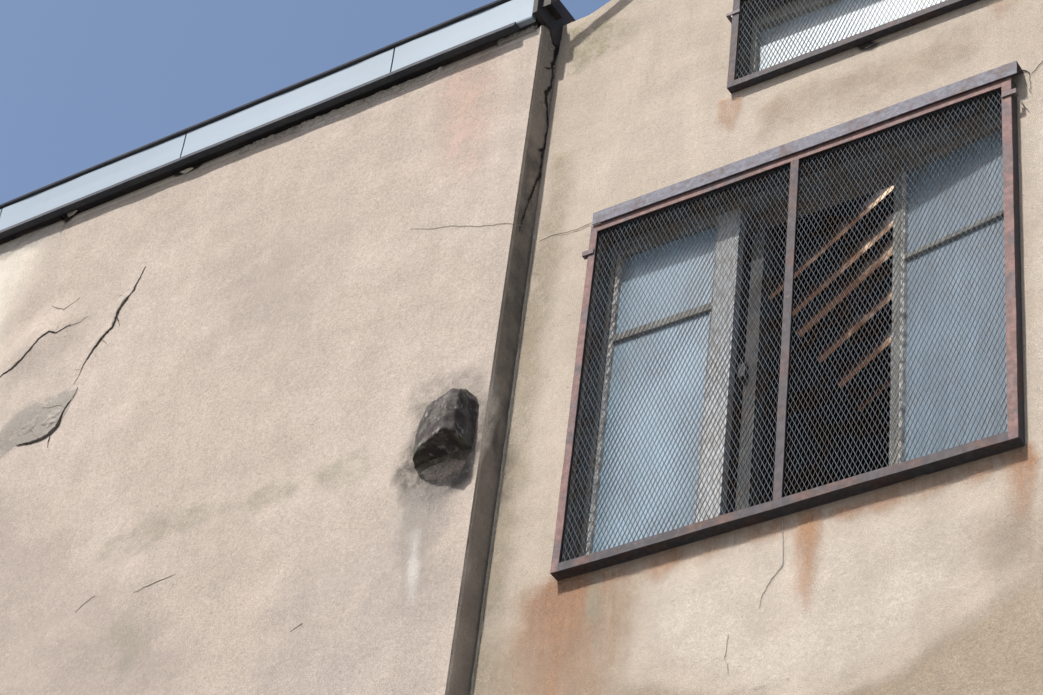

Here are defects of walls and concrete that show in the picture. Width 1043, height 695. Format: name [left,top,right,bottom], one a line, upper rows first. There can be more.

crack [412,43,590,241]
spalling [0,389,75,457]
crack [0,266,146,448]
water stain [0,33,565,695]
crack [759,519,784,608]